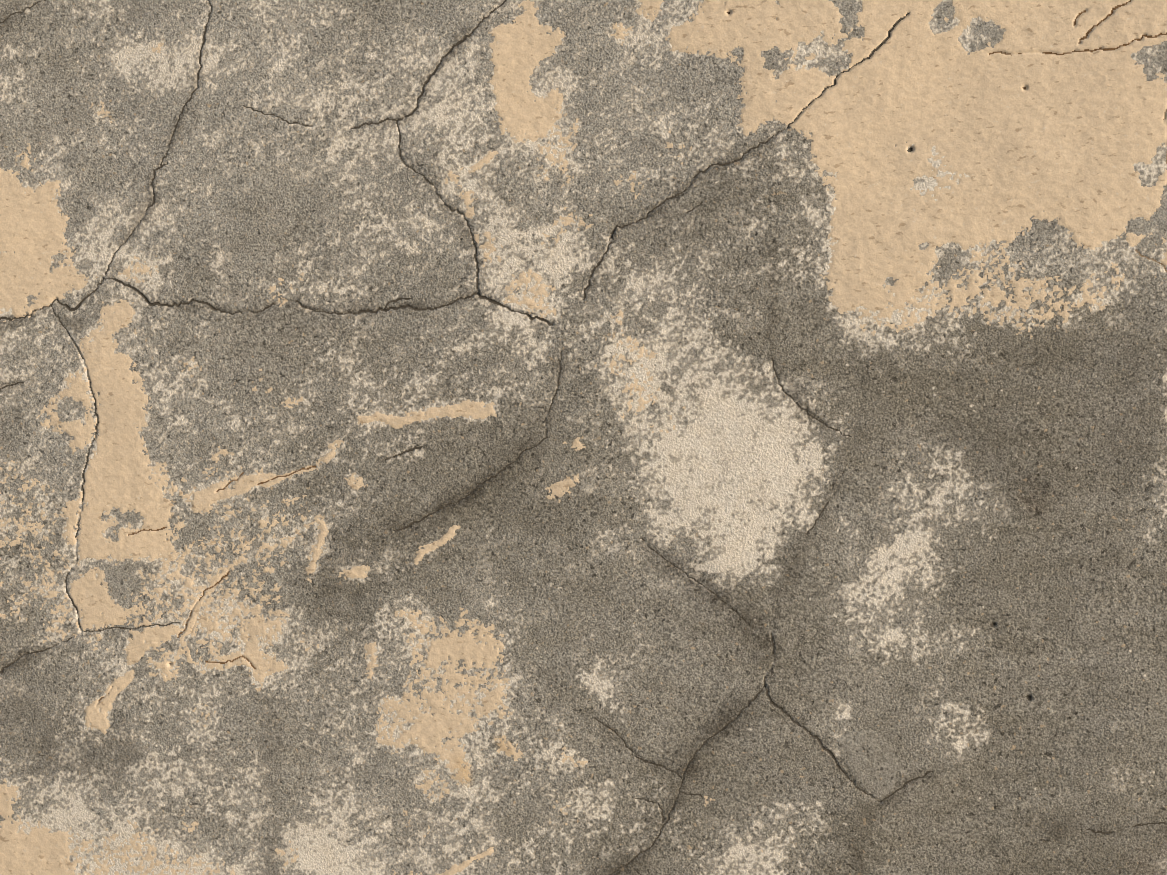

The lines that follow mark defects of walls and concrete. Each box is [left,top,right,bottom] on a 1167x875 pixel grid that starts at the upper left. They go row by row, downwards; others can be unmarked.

peeling [0,143,89,322]
peeling [488,0,579,188]
crack [583,13,909,300]
peeling [665,0,1167,339]
crack [989,0,1167,56]
crack [0,0,562,673]
peeling [357,400,497,429]
crack [772,358,851,437]
peeling [0,299,344,735]
crack [806,501,829,535]
peeling [375,607,514,802]
crack [594,538,933,875]